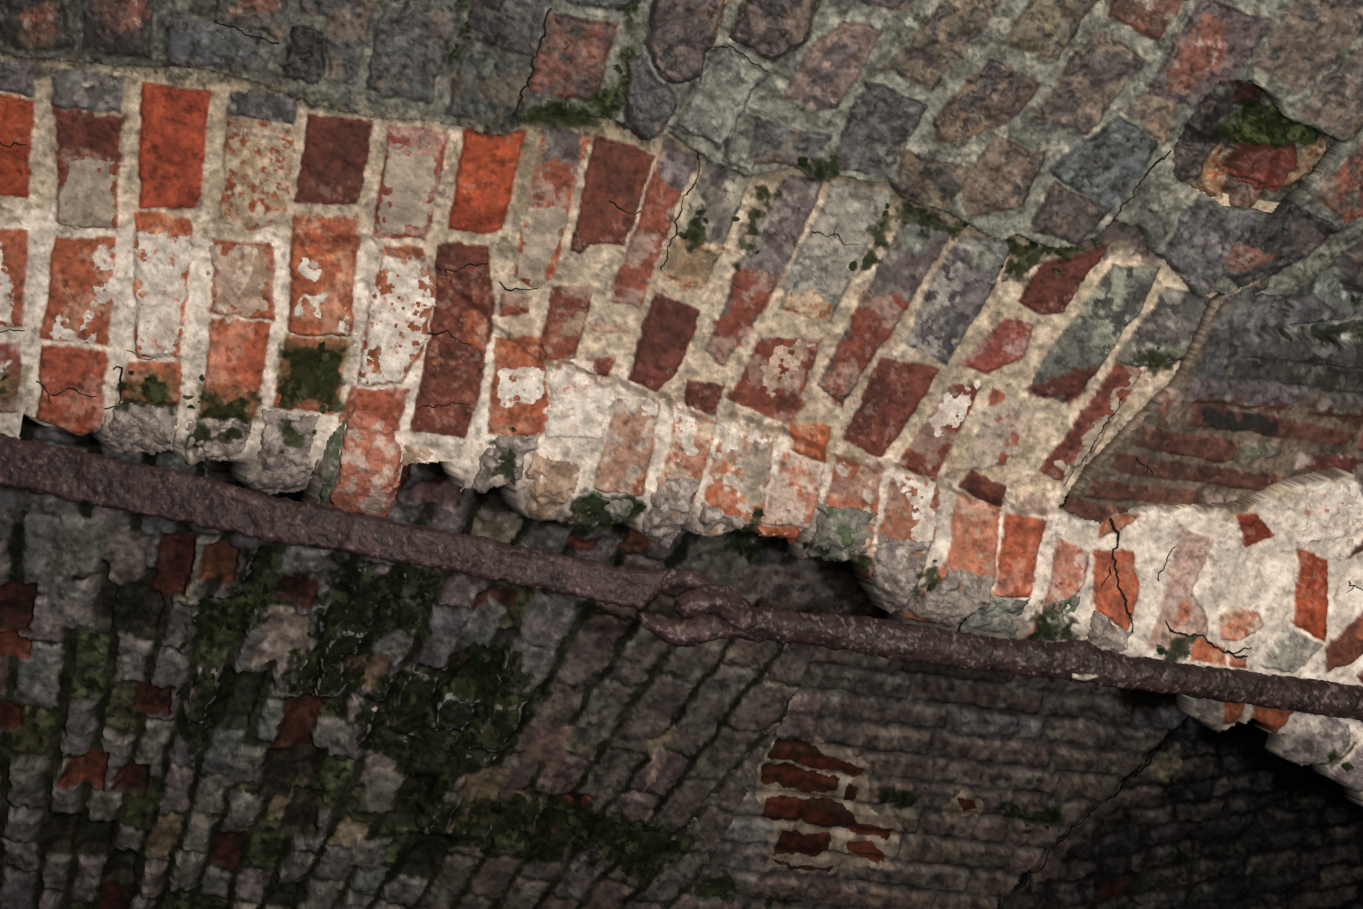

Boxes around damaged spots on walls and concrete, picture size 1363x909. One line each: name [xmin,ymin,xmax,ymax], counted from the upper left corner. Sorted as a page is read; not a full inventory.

spalling [1173,80,1336,208]
spalling [401,444,454,467]
peeling [460,359,1137,652]
peeling [1302,477,1363,547]
crack [1002,715,1189,909]